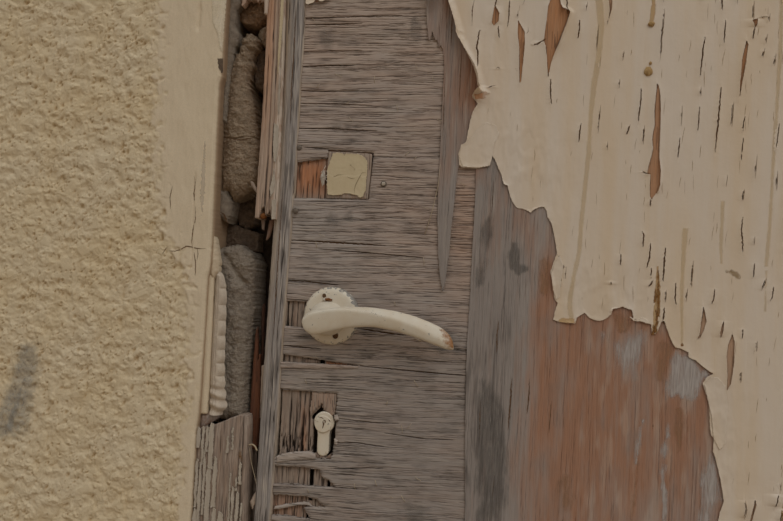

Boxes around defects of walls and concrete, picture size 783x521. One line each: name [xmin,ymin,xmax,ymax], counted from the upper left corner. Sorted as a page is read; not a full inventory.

peeling [544,0,569,72]
peeling [740,43,748,92]
peeling [459,122,499,168]
peeling [647,85,661,199]
crack [163,177,206,273]
spalling [253,123,279,343]
peeling [551,256,563,299]
peeling [704,323,735,450]
peeling [192,418,242,521]